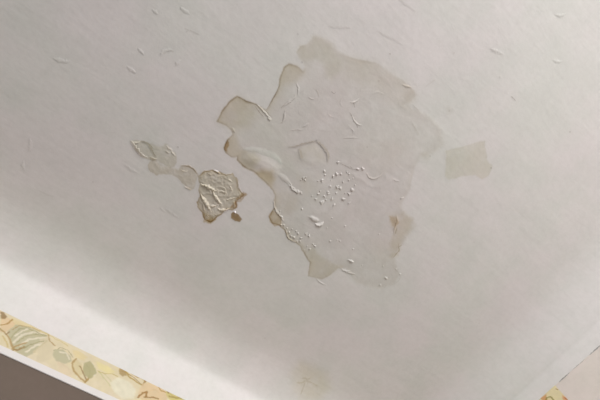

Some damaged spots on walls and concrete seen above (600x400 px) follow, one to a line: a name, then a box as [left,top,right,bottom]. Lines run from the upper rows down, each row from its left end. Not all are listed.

peeling [129,138,243,220]
damp [211,31,434,222]
peeling [254,64,447,291]
damp [444,140,494,181]
damp [305,244,346,280]